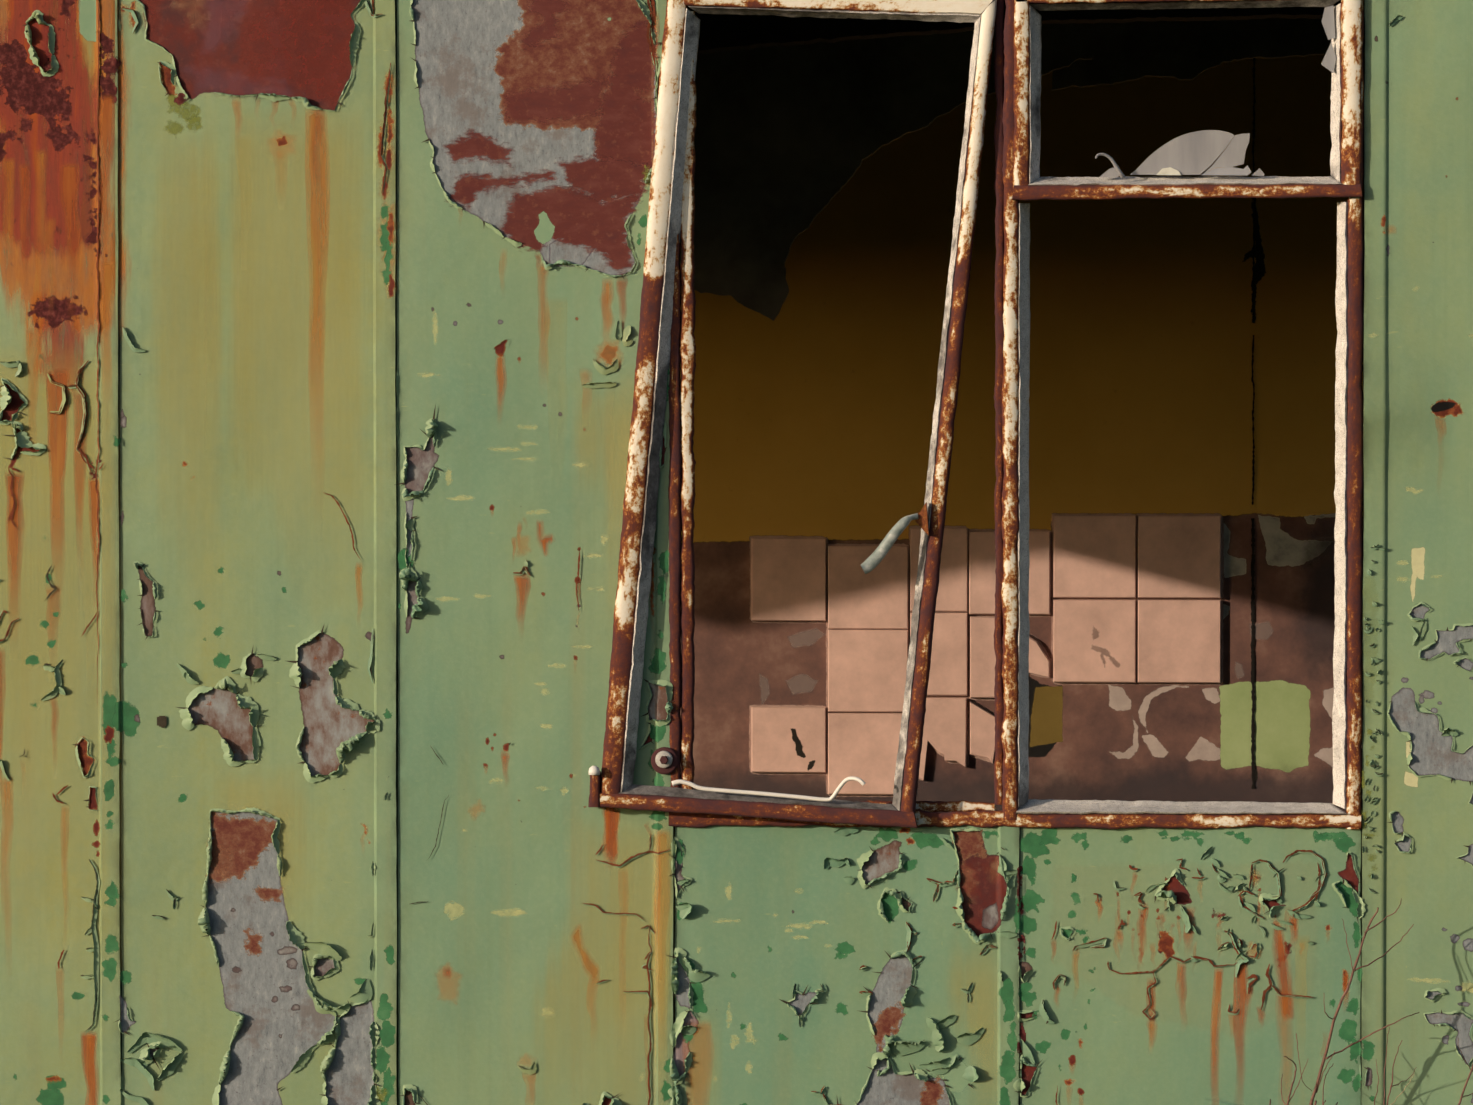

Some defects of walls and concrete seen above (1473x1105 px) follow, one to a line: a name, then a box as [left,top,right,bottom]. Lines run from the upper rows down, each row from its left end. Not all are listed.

peeling [377,71,395,297]
peeling [409,0,662,342]
corrosion [0,0,127,679]
peeling [394,405,443,633]
corrosion [593,413,632,492]
peeling [177,626,264,767]
peeling [198,807,419,1105]
peeling [287,623,392,783]
peeling [638,541,893,802]
corrosion [1117,877,1198,962]
peeling [857,513,1473,1105]
corrosion [1201,847,1329,1030]